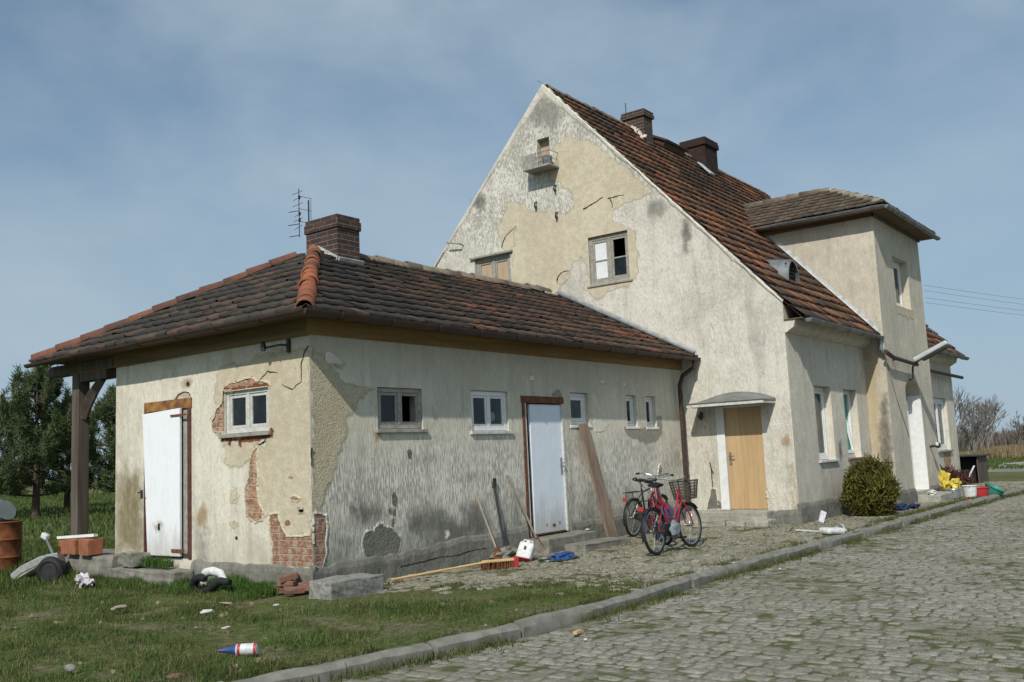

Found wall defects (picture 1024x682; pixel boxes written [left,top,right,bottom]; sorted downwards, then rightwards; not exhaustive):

flaking render [496,136,652,300]
crack [583,195,622,210]
crack [212,345,309,427]
flaking render [211,348,373,569]
spalling [361,492,402,558]